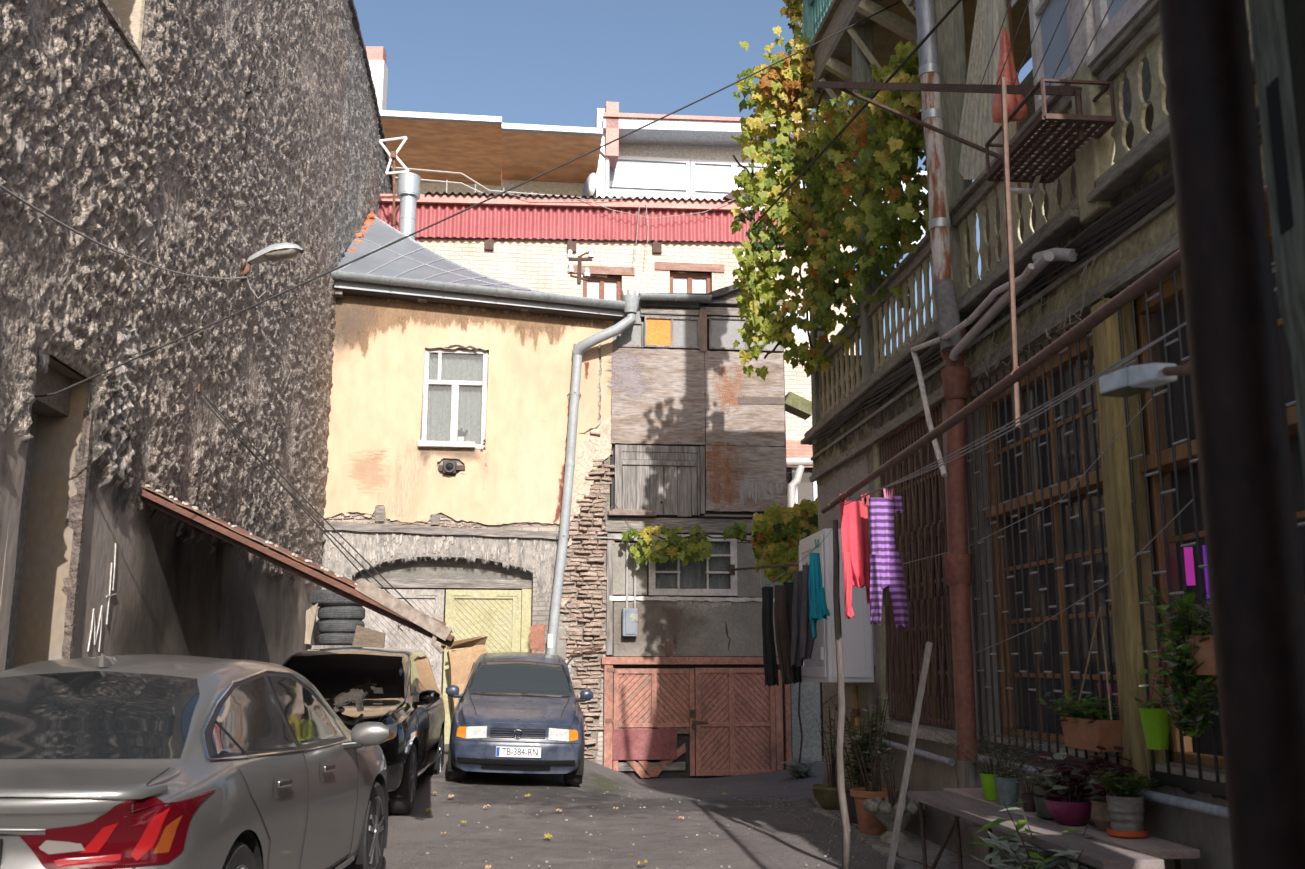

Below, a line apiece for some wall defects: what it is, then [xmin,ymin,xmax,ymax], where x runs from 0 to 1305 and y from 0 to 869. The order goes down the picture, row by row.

damp [334,294,604,356]
spalling [62,411,94,659]